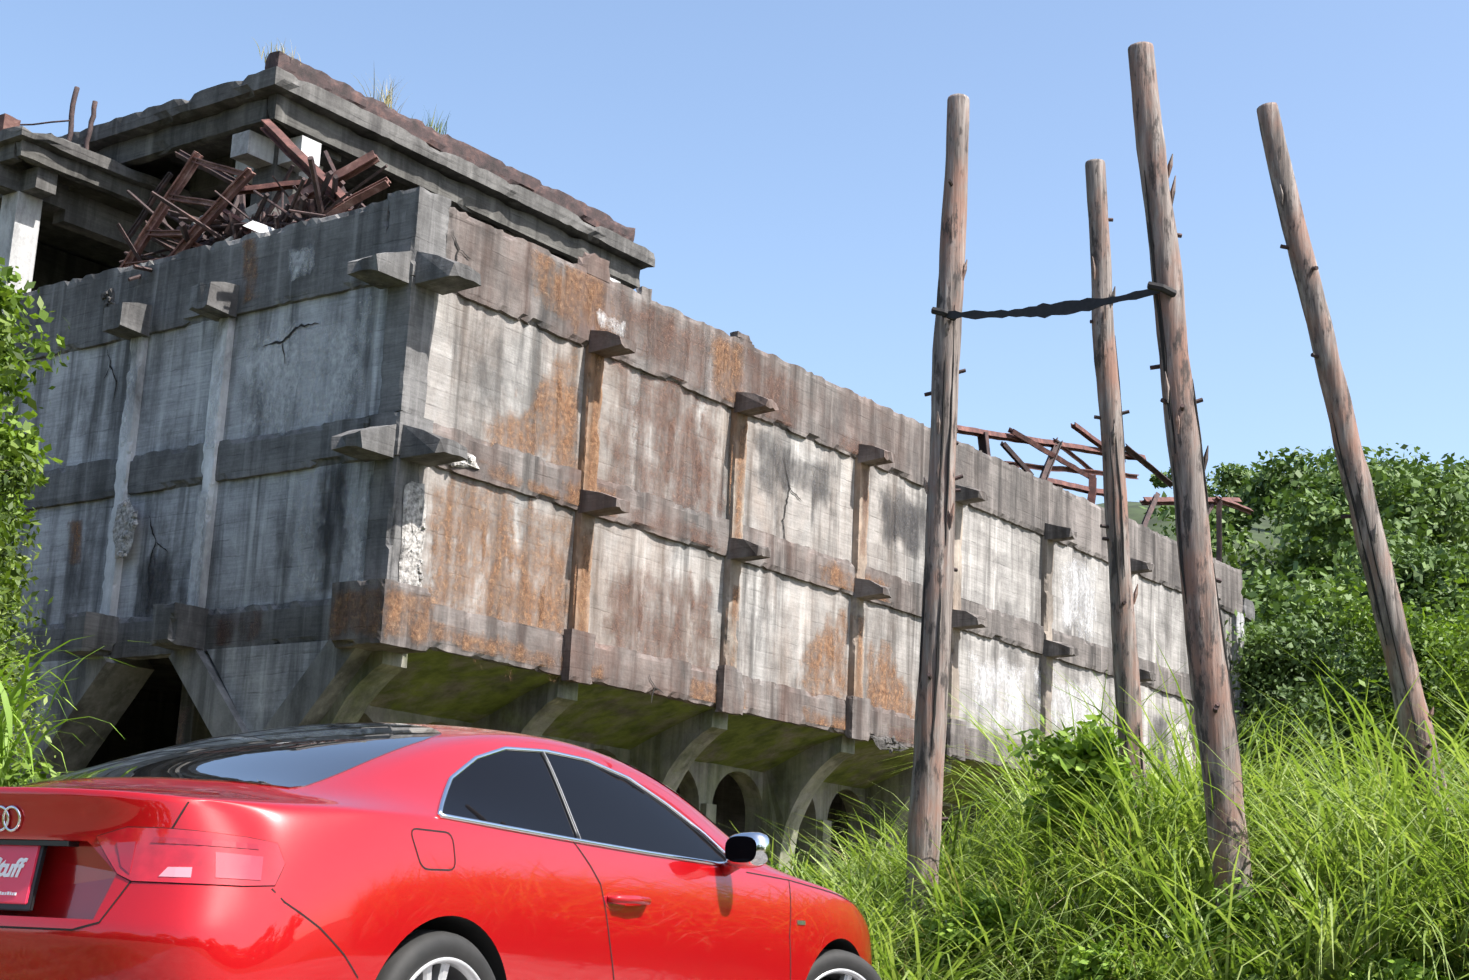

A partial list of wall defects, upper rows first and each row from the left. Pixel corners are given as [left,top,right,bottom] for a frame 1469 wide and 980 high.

crack [263,322,319,361]
corrosion [488,354,621,506]
corrosion [617,380,745,538]
corrosion [387,484,591,640]